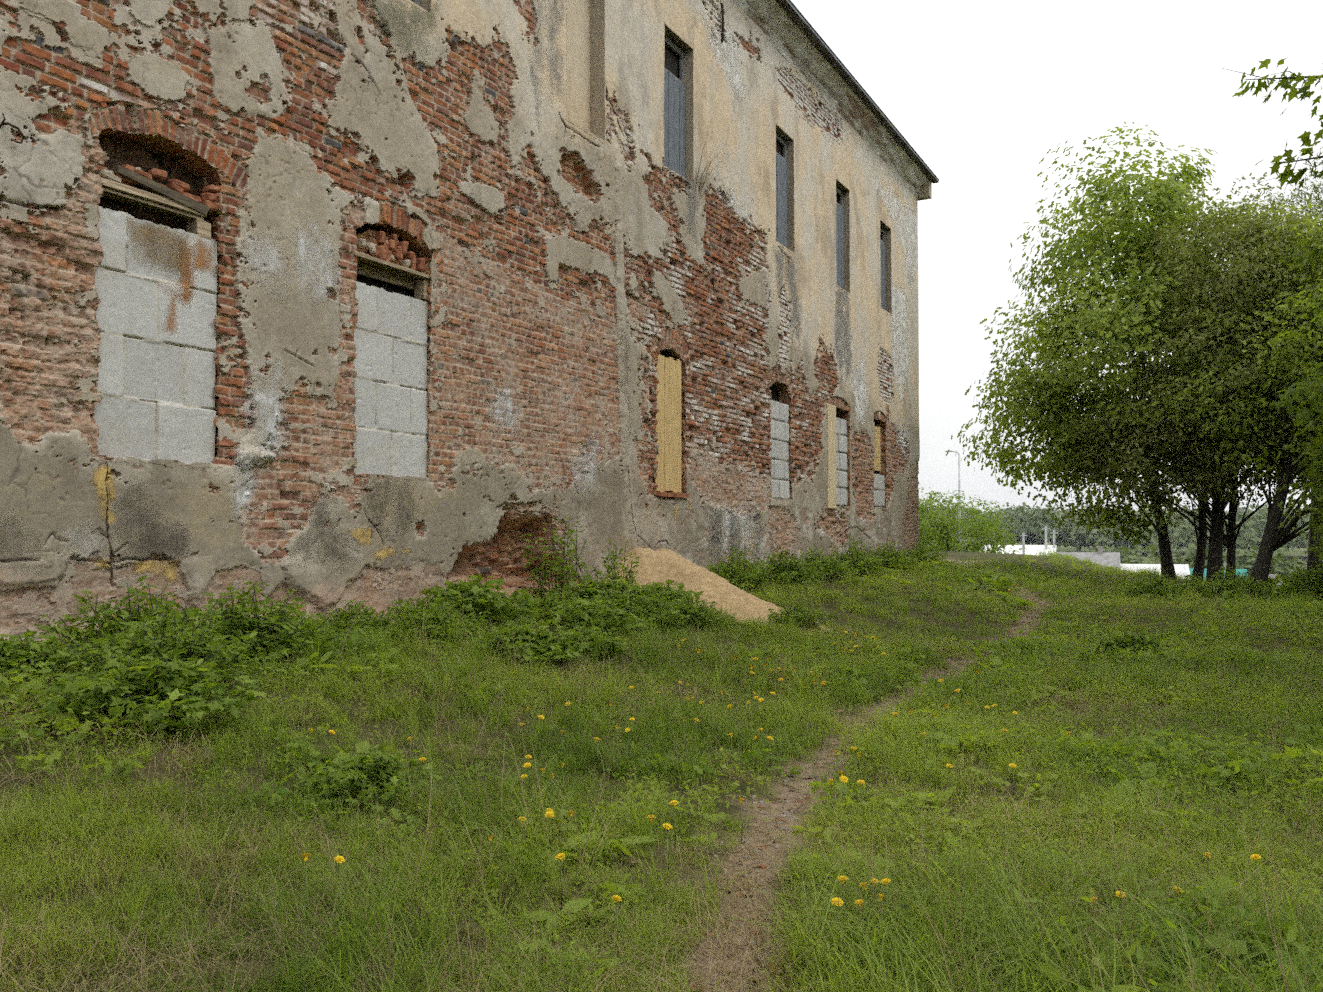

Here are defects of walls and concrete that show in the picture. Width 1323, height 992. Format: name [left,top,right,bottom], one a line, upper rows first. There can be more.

spalling [0,0,843,655]
crack [0,463,172,586]
spalling [814,342,920,556]